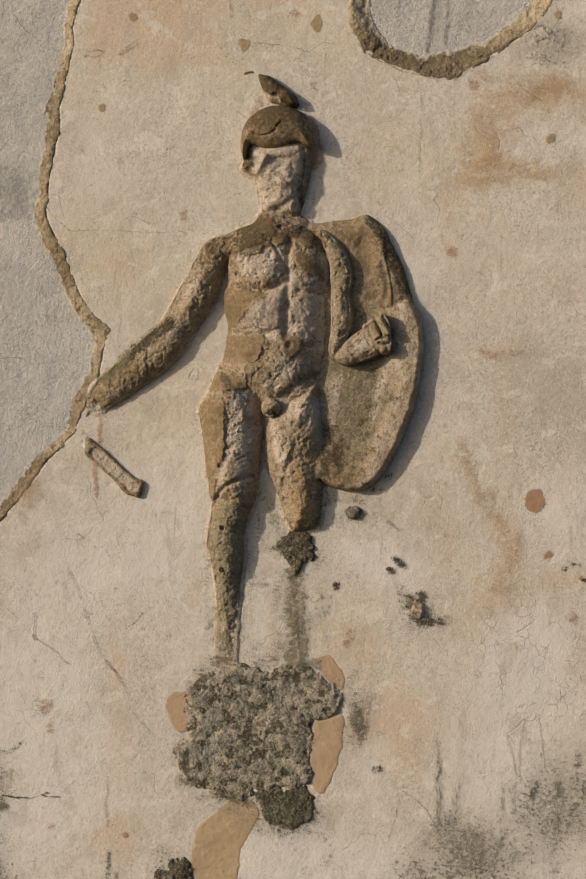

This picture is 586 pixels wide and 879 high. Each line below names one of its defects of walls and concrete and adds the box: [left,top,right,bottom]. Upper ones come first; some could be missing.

damp [394,714,586,879]